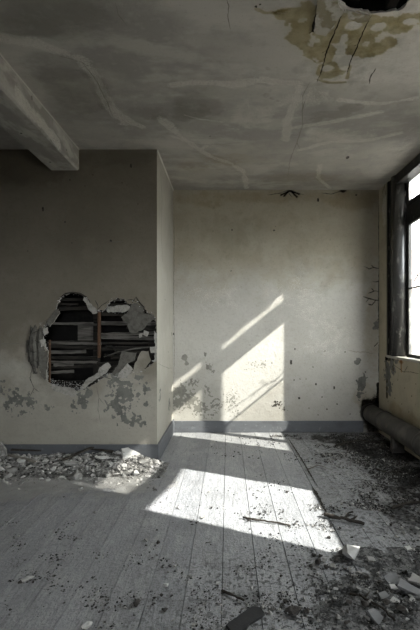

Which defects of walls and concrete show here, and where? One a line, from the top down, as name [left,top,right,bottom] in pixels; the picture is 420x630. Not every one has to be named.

crack [288,10,345,174]
crack [363,265,379,320]
peeling [0,380,37,417]
spalling [39,292,157,429]
peeling [168,378,246,419]
peeling [356,371,368,401]